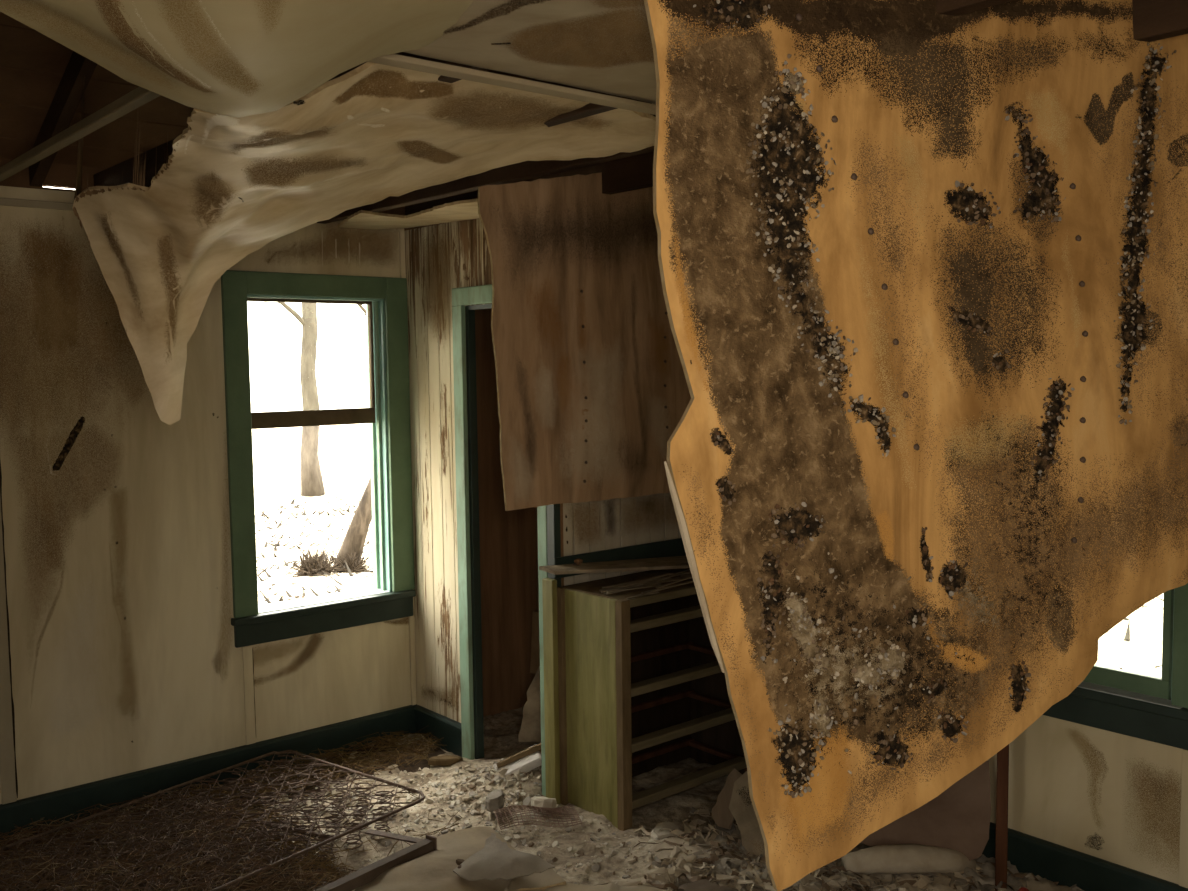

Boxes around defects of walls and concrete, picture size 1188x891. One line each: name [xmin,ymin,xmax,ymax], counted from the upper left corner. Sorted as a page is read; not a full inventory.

water stain [693,0,770,32]
water stain [333,69,613,132]
water stain [188,126,368,231]
water stain [397,140,463,164]
water stain [157,233,182,361]
peeling [825,332,845,382]
water stain [0,211,153,723]
water stain [569,43,1188,874]
peeling [876,509,895,562]
peeling [926,618,992,674]
peeling [773,587,915,856]